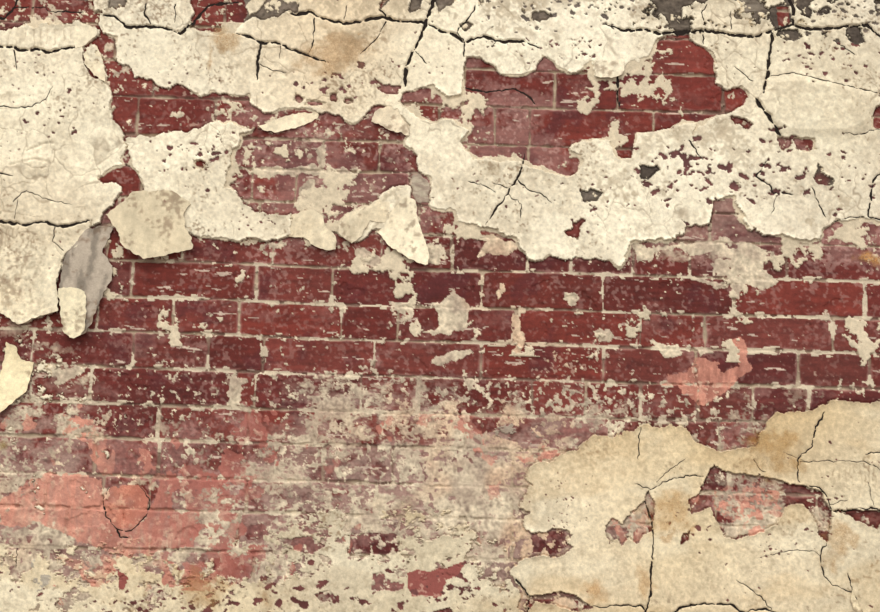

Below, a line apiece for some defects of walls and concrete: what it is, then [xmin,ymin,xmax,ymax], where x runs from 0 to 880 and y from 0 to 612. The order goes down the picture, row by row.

crack [0,46,75,69]
crack [0,0,239,35]
crack [236,0,540,87]
crack [602,0,880,136]
peeling [734,0,880,51]
peeling [0,0,750,338]
crack [0,172,92,250]
peeling [0,342,34,412]
peeling [408,563,464,599]
spalling [516,527,574,559]
crack [593,459,697,612]
spalling [688,465,880,547]